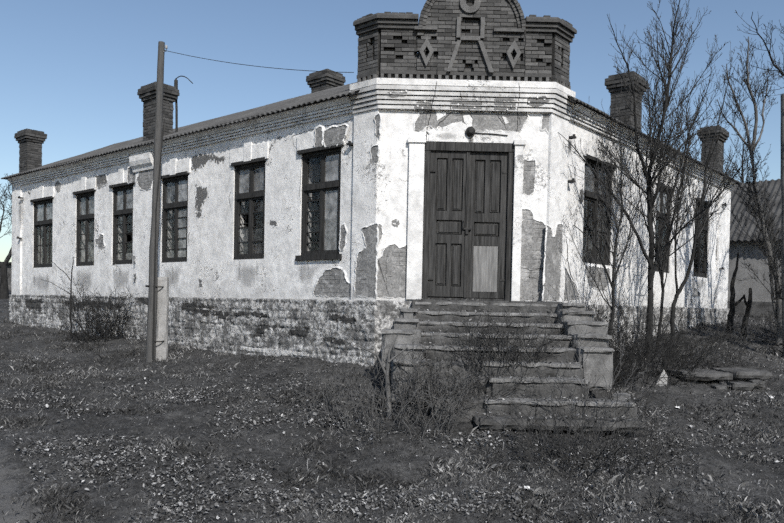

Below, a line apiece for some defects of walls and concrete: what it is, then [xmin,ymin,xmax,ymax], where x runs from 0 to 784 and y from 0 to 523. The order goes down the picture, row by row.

peeling [314,123,349,148]
peeling [413,96,545,133]
peeling [539,113,554,134]
peeling [127,167,153,192]
peeling [191,153,226,173]
peeling [522,159,537,195]
peeling [195,184,209,217]
peeling [313,222,407,299]
peeling [520,207,579,302]
peeling [584,264,611,291]